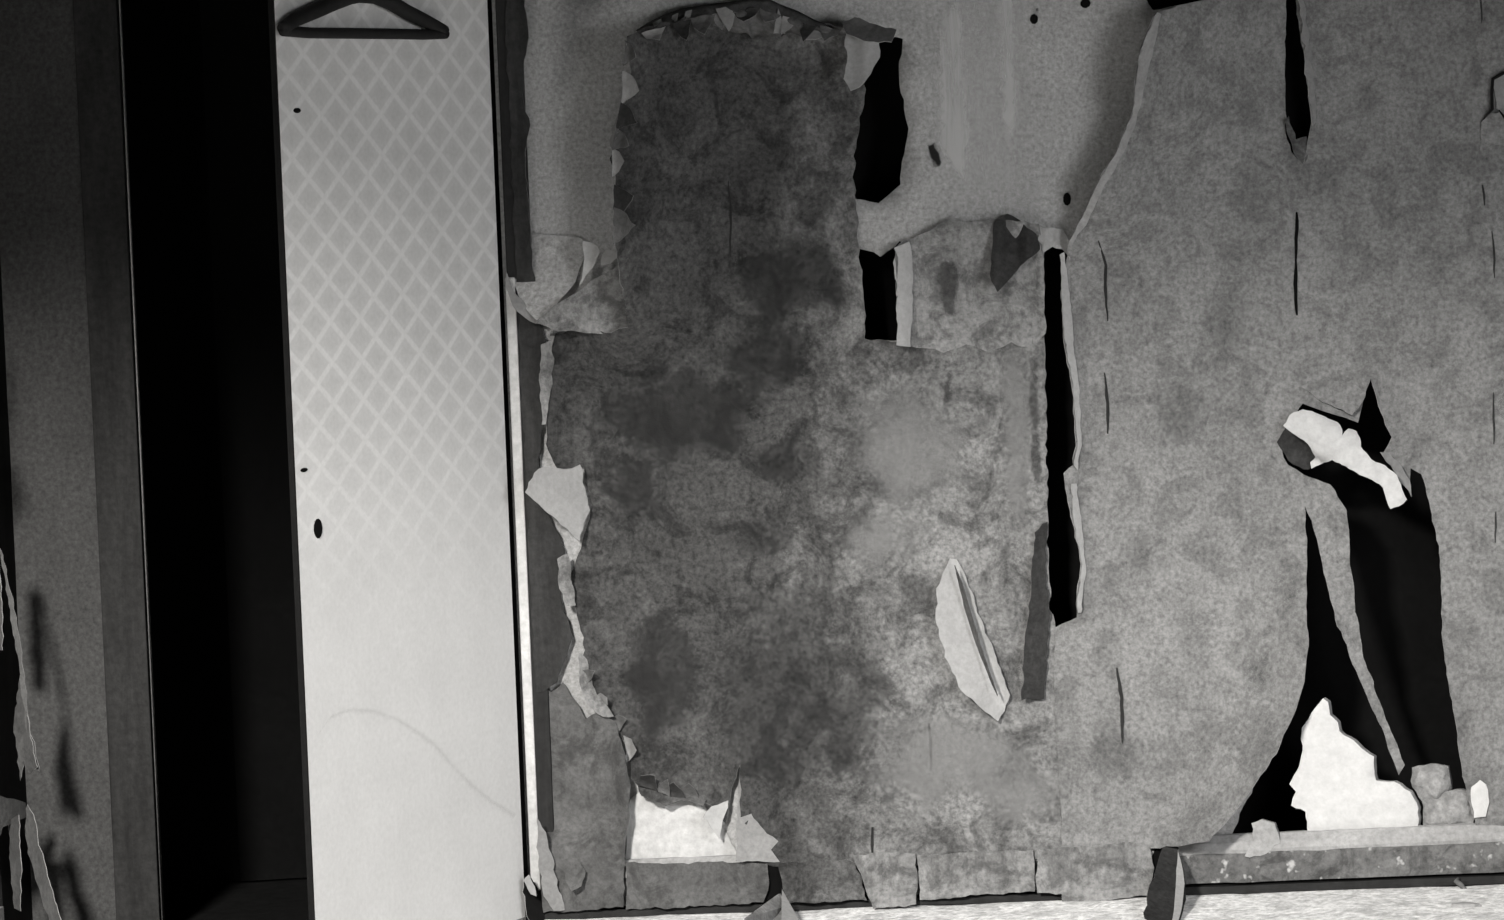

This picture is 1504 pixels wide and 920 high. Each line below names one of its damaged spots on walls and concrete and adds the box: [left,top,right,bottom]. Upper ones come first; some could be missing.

spalling [842,17,908,203]
spalling [1147,0,1199,10]
spalling [1285,0,1311,152]
peeling [515,233,627,334]
spalling [859,241,901,340]
damp [939,264,957,314]
peeling [525,465,590,541]
damp [1007,363,1041,515]
spalling [1044,247,1081,627]
peeling [935,558,1010,721]
spalling [1232,379,1466,857]
flaking render [626,768,779,862]